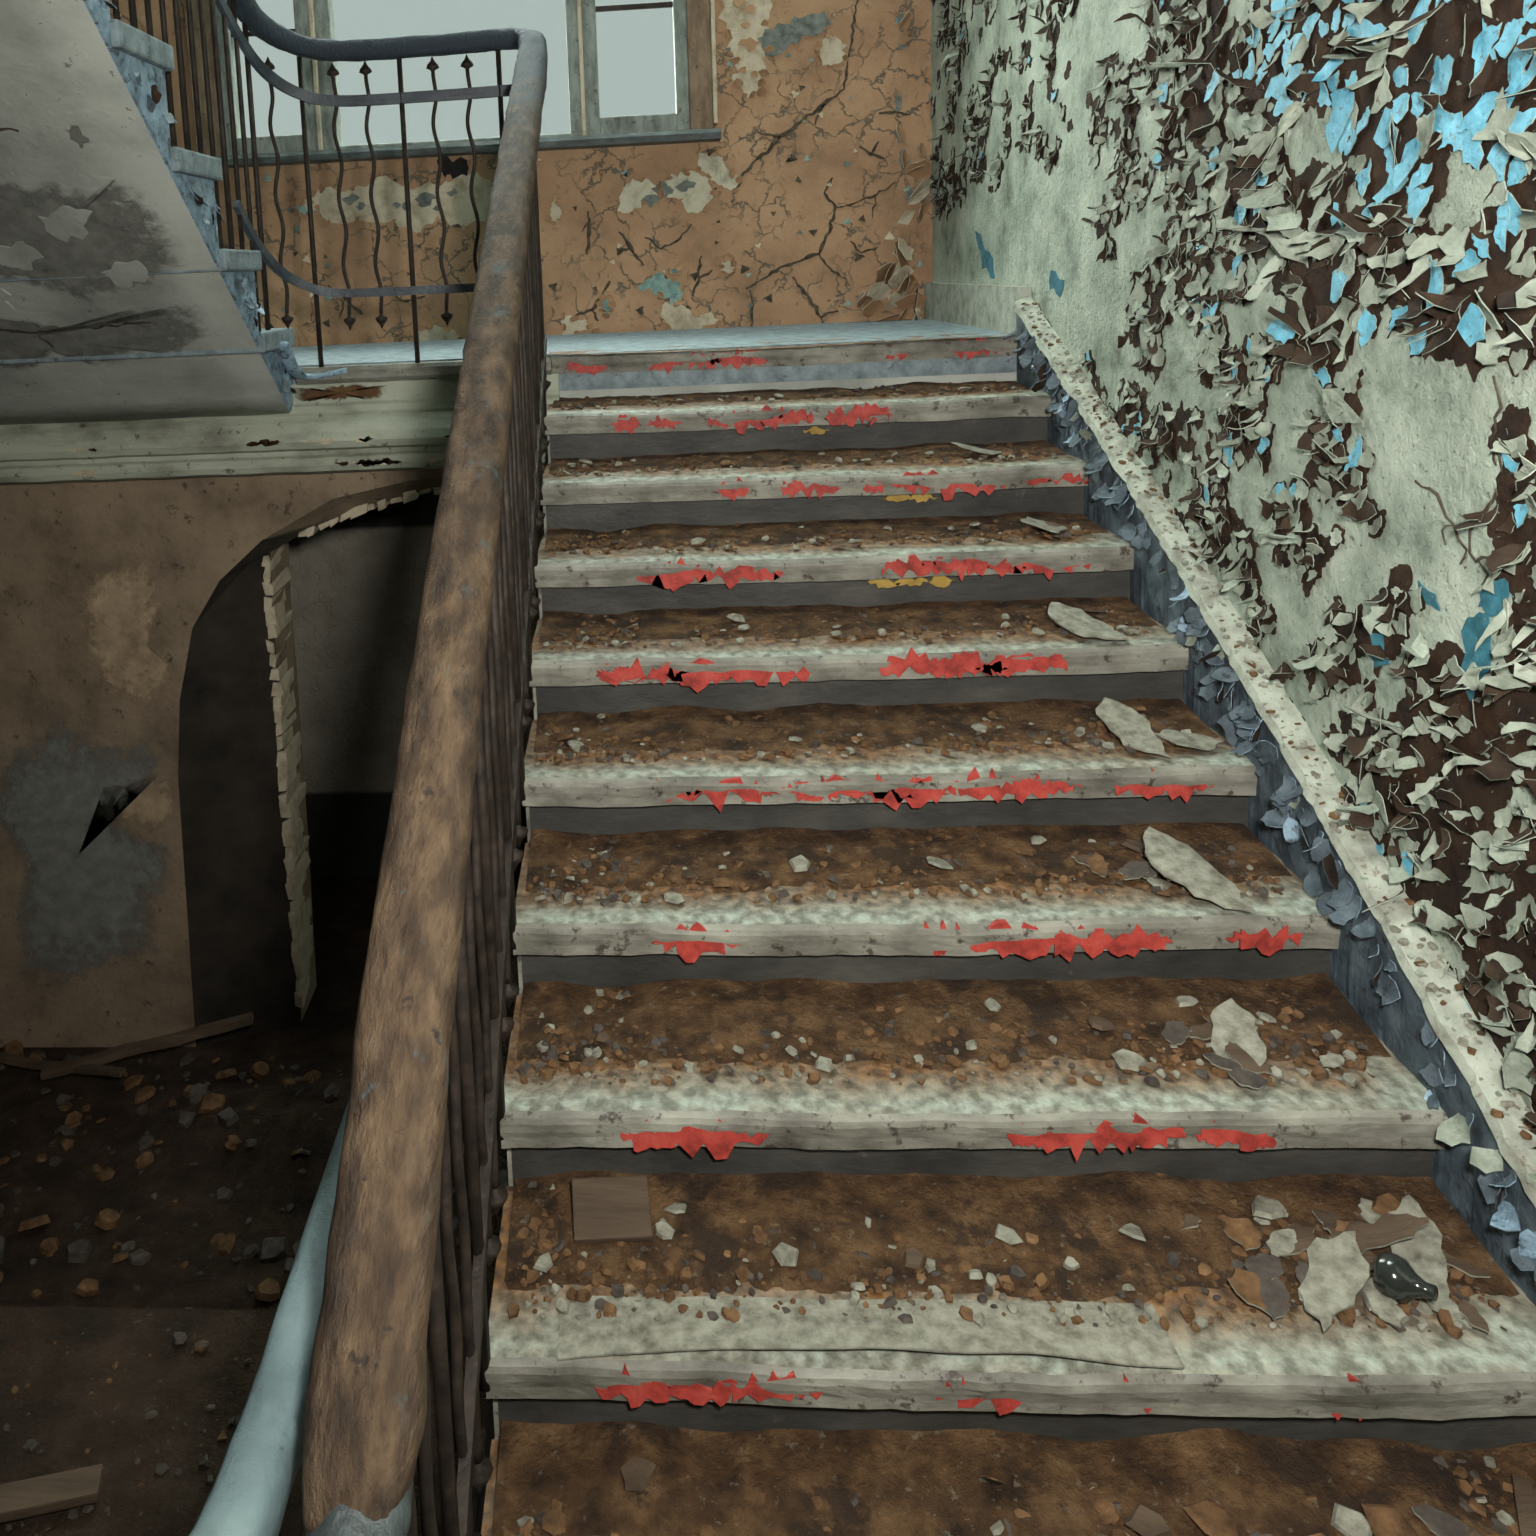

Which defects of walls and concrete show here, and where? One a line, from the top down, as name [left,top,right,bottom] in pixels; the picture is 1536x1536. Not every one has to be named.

crack [734,0,859,194]
peeling [287,166,494,269]
crack [575,211,713,322]
peeling [559,148,751,335]
crack [746,111,911,326]
peeling [844,0,1536,1149]
peeling [595,656,810,693]
peeling [667,767,1082,812]
peeling [620,1119,769,1160]
peeling [1007,1112,1277,1162]
peeling [1419,1021,1536,1281]
peeling [595,1364,823,1408]